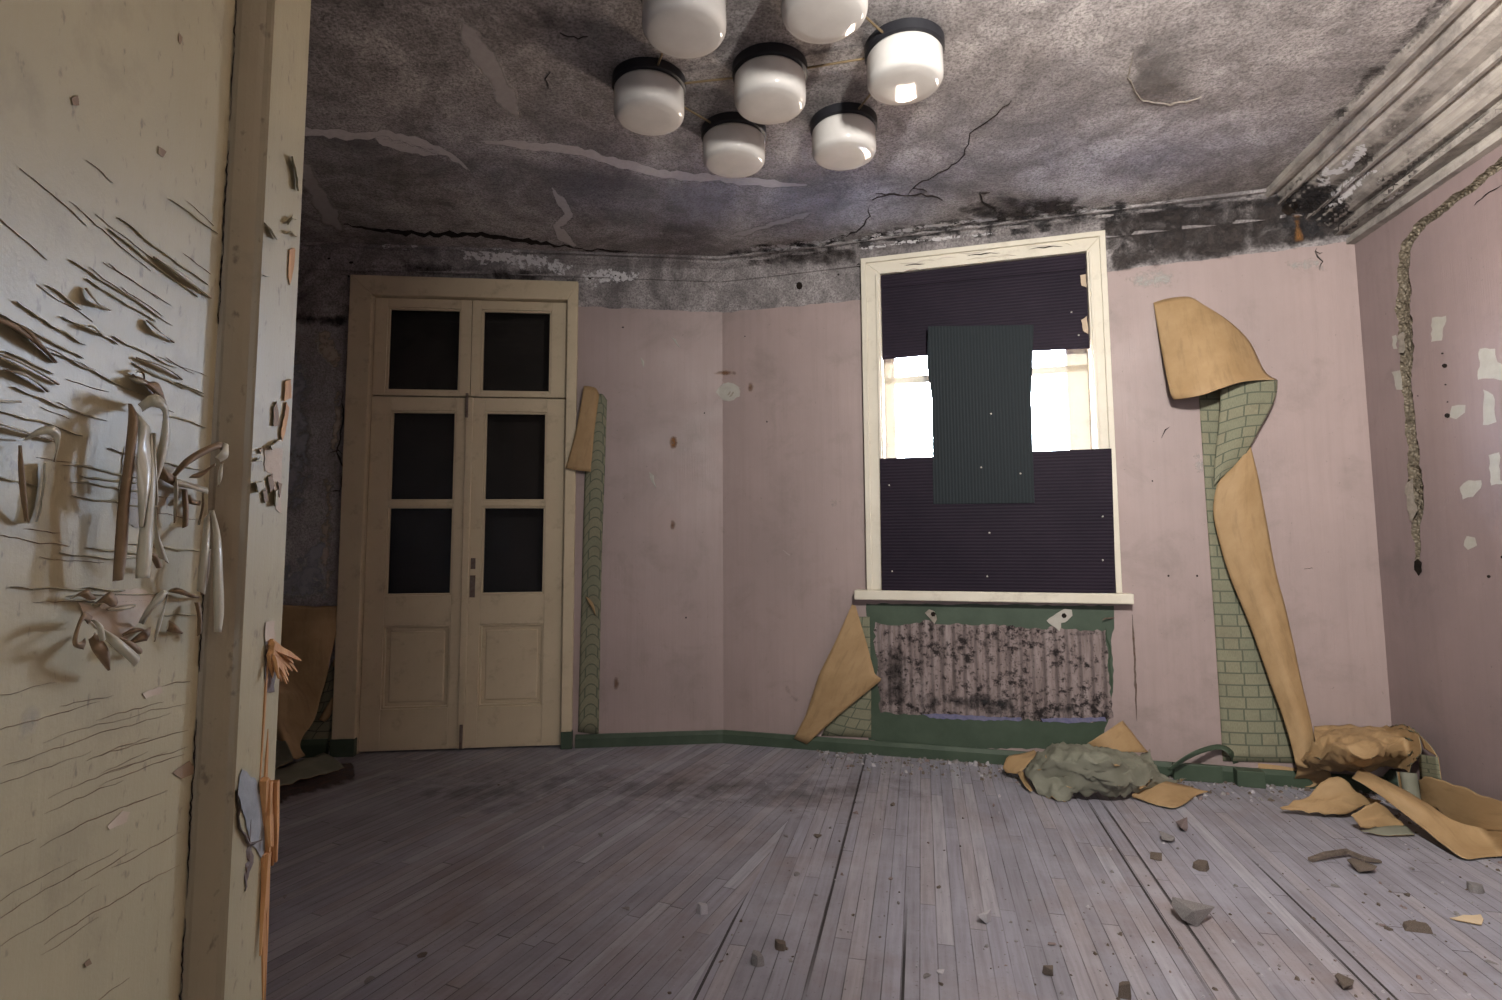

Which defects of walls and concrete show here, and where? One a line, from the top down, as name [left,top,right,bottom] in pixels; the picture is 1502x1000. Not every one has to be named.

crack [303,0,1012,253]
peeling [263,215,297,284]
mould [729,173,1357,270]
peeling [0,318,60,392]
crack [1394,157,1502,576]
peeling [1431,316,1502,425]
peeling [0,423,61,524]
peeling [69,357,229,671]
peeling [254,379,292,513]
peeling [1460,452,1502,500]
mould [866,603,1114,749]
peeling [238,769,265,858]